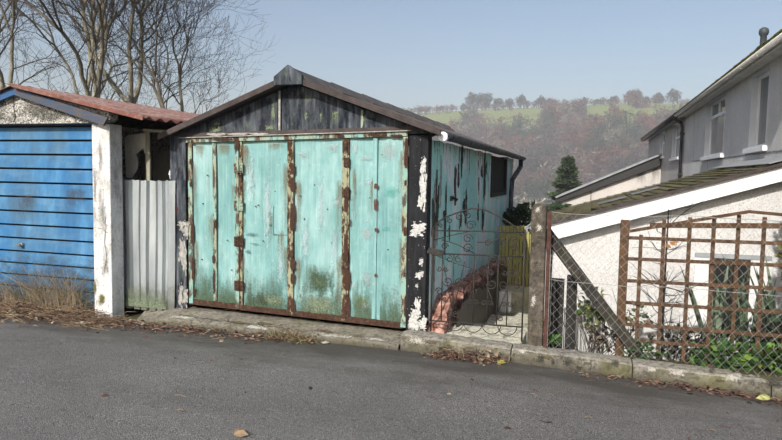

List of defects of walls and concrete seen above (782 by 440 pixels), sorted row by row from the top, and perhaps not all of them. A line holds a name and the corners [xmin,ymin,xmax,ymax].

peeling [177,221,190,309]
corrosion [283,162,300,231]
corrosion [285,249,300,284]
corrosion [338,174,356,319]
peeling [408,259,427,331]
peeling [409,145,468,306]
peeling [477,151,487,231]